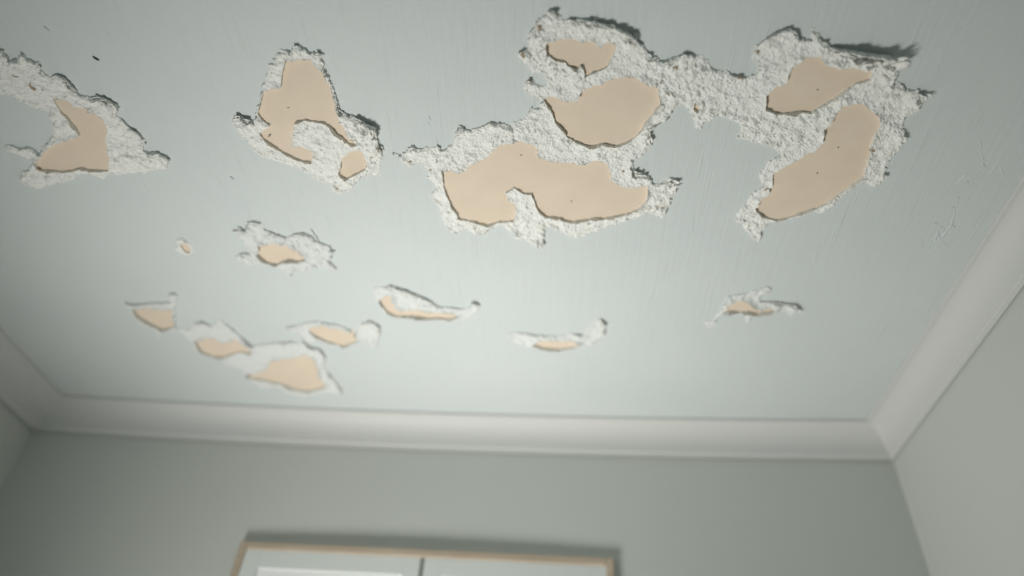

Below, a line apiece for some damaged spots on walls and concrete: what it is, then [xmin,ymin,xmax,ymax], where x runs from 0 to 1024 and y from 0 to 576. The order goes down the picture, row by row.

peeling [0,49,170,189]
peeling [232,9,934,249]
peeling [231,220,338,277]
peeling [124,292,380,398]
peeling [373,285,480,322]
peeling [507,318,606,352]
peeling [705,286,802,328]